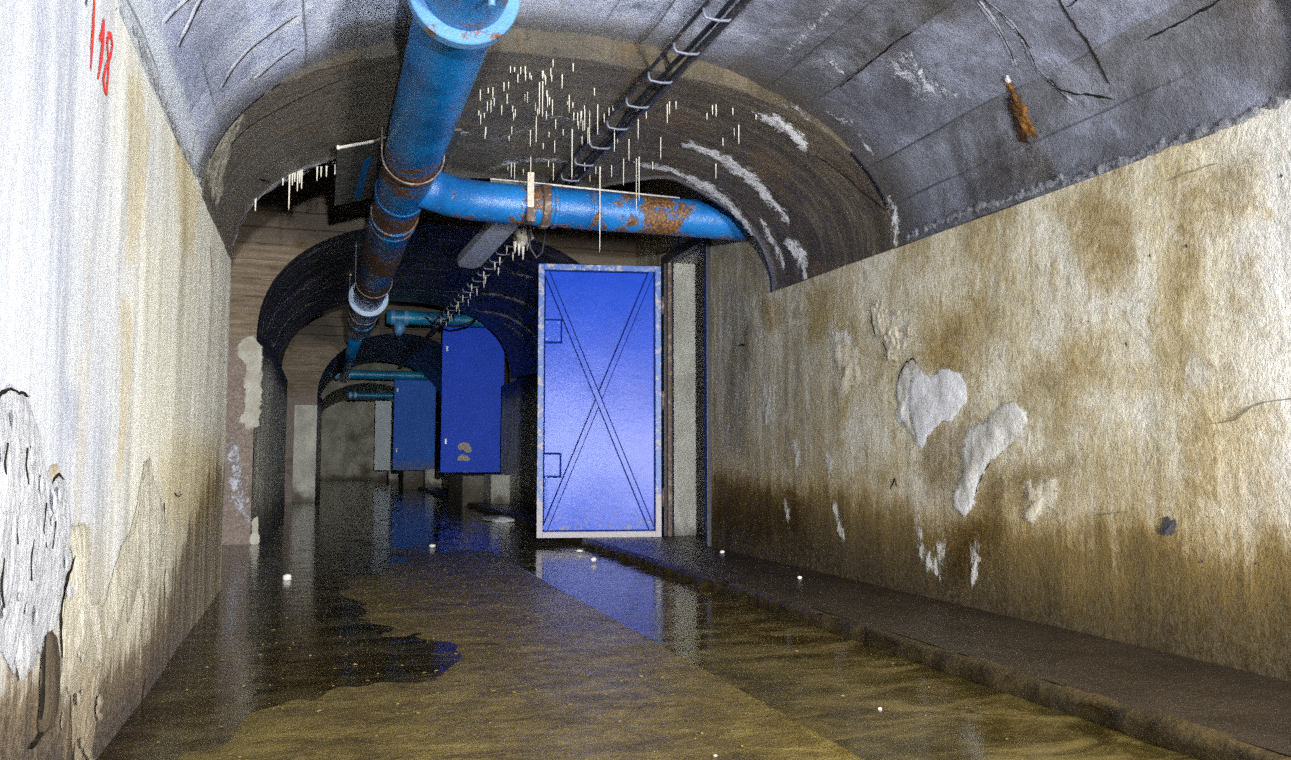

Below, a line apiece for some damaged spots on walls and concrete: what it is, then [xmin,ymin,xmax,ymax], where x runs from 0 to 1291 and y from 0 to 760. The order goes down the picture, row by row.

crack [161,0,203,48]
crack [976,0,1113,106]
corrosion [1004,75,1038,143]
efflorescence [633,140,808,279]
crack [0,387,29,397]
flaking render [237,336,263,430]
spalling [833,298,967,448]
spalling [952,401,1028,517]
flaking render [0,384,172,760]
damp [833,501,845,540]
efflorescence [914,514,946,579]
damp [967,537,981,589]